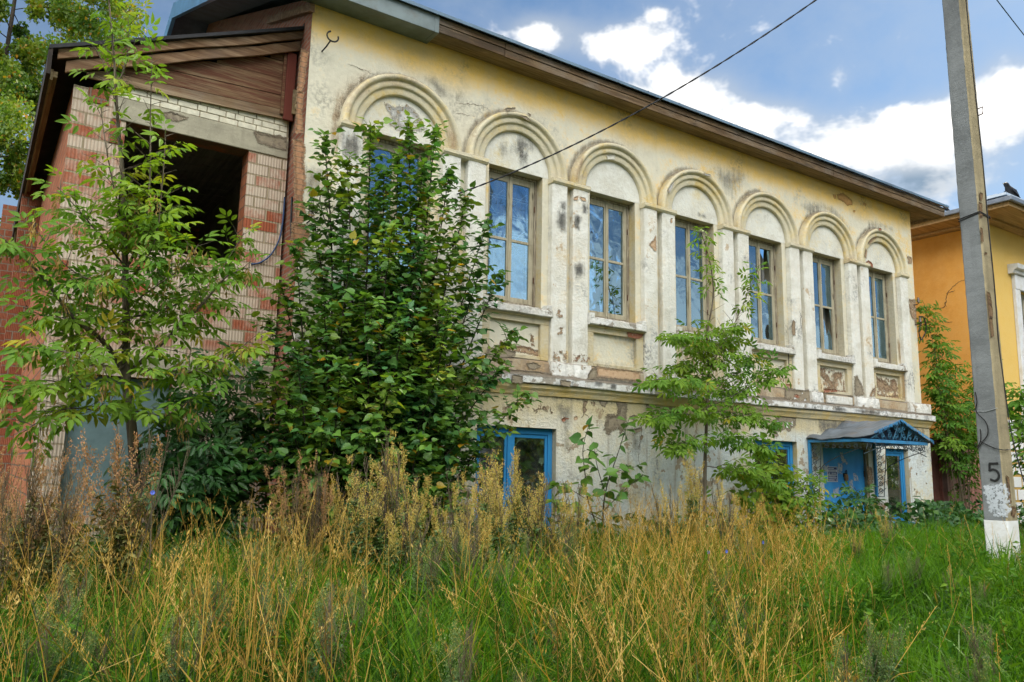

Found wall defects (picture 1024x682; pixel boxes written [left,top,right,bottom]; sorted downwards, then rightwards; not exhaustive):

peeling [561,400,651,440]